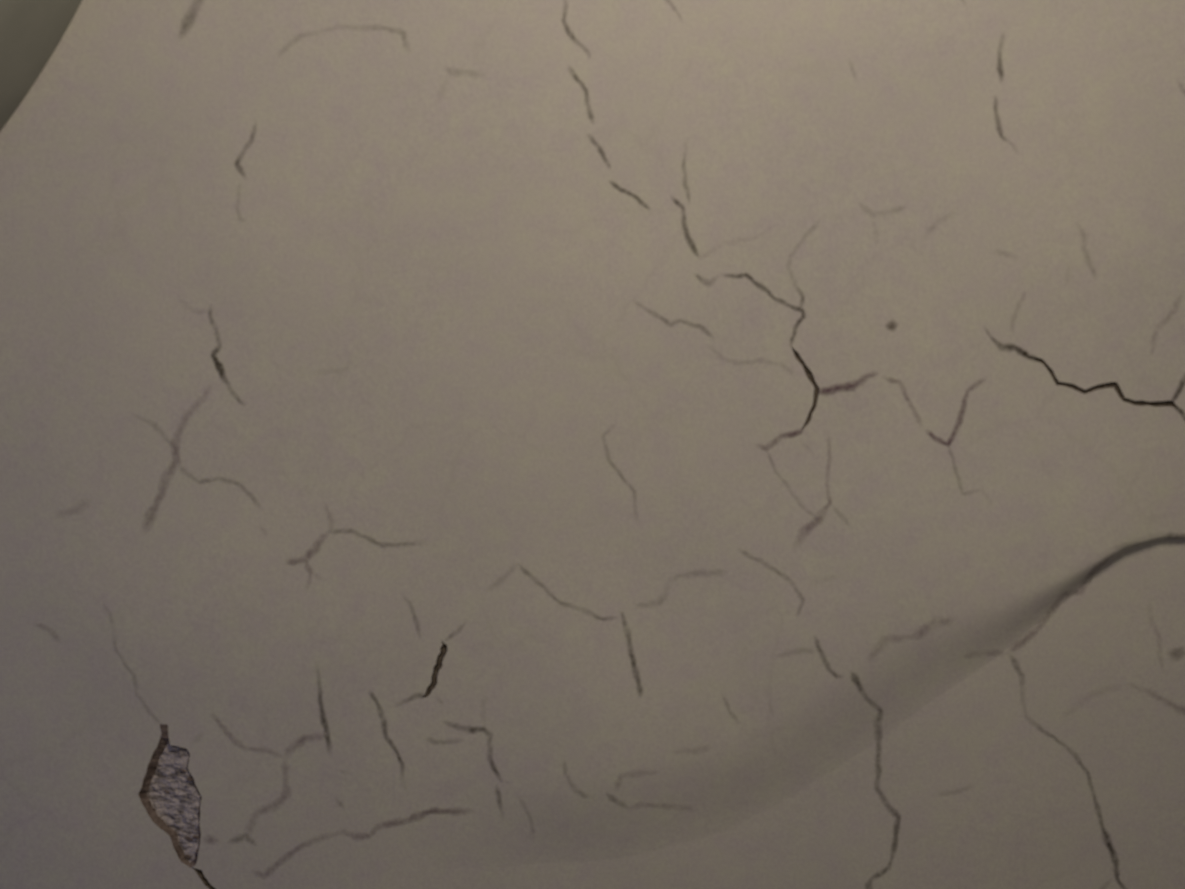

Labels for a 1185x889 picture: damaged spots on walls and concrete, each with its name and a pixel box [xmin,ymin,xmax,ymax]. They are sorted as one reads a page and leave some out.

crack [212,354,223,376]
crack [740,274,857,436]
crack [1007,345,1183,413]
crack [422,641,447,698]
spalling [138,724,202,868]
crack [192,867,215,889]